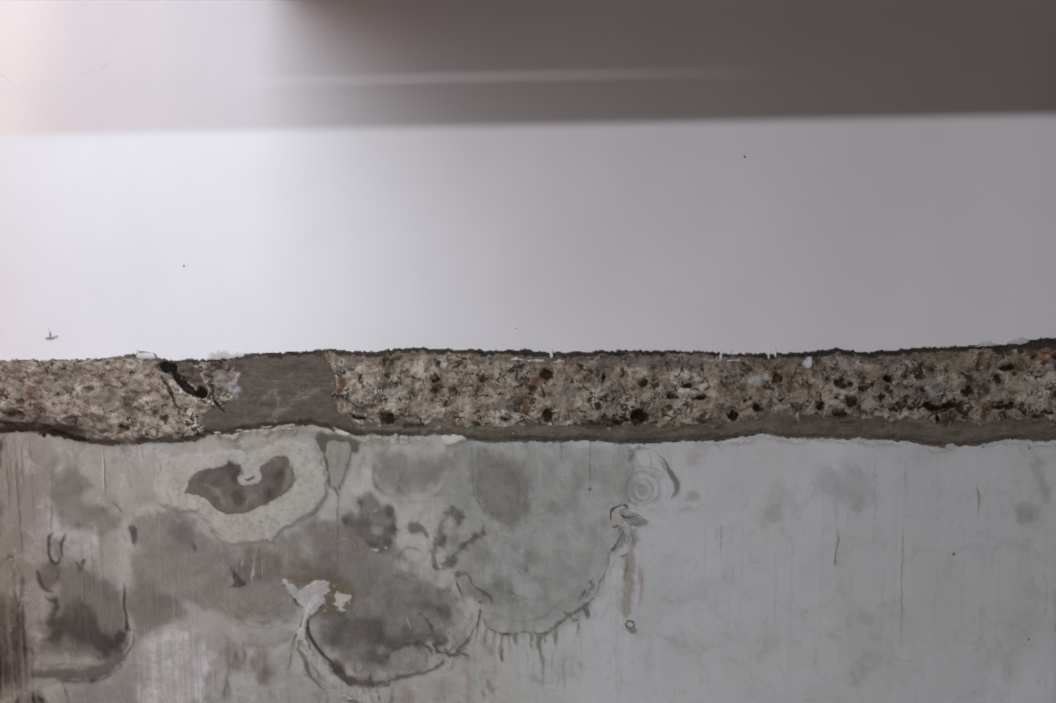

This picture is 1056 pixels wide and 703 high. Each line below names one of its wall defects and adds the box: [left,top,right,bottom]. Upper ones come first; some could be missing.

spalling [0,337,1056,449]
water stain [315,431,359,494]
water stain [665,462,679,496]
water stain [0,446,640,703]